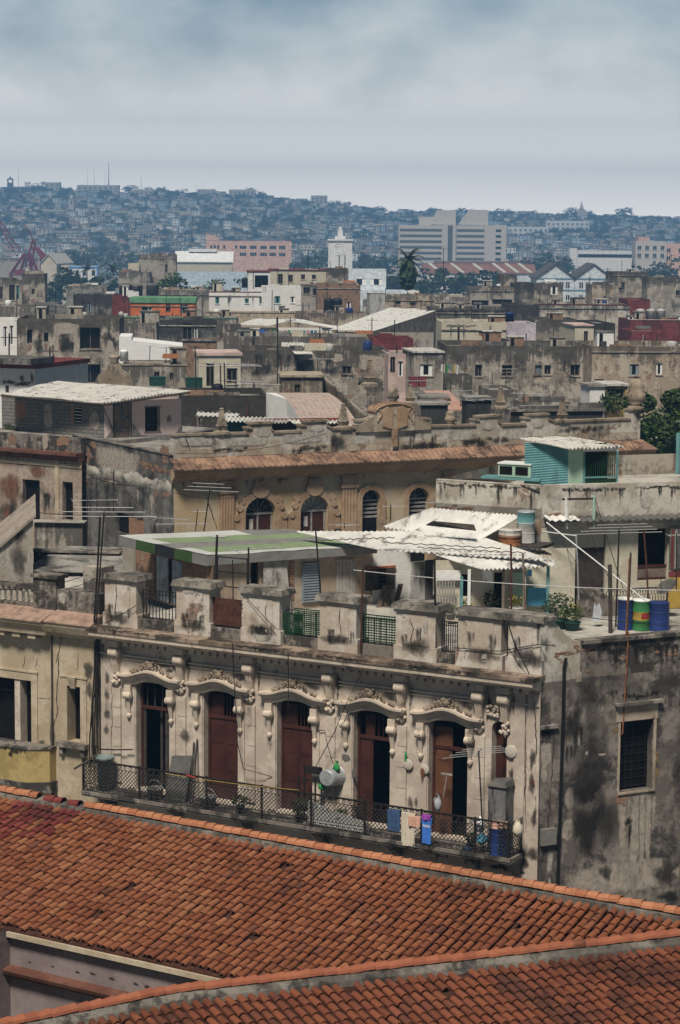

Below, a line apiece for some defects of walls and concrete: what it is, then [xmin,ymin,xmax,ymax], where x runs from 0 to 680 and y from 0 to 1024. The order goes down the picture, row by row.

damp [439,482,540,510]
damp [563,487,626,496]
damp [181,613,201,630]
damp [514,637,542,666]
damp [542,681,679,900]